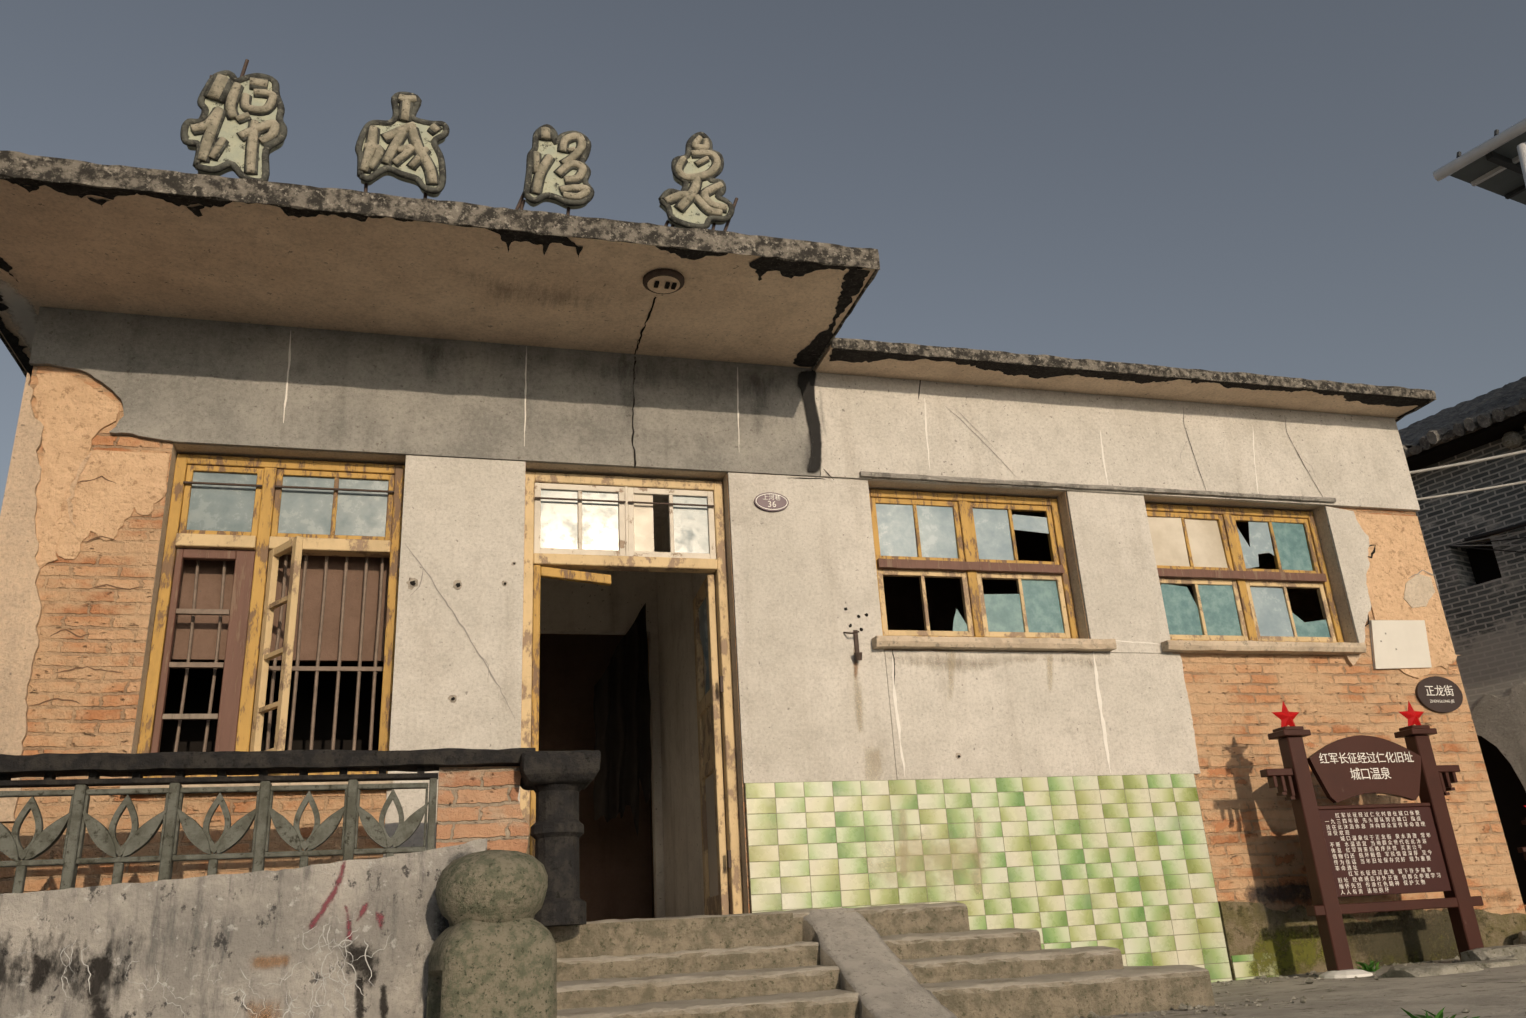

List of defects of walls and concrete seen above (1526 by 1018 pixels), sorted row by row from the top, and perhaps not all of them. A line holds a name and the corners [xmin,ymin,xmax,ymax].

peeling [0,178,413,222]
peeling [0,257,18,282]
peeling [485,228,583,257]
peeling [656,246,728,260]
peeling [749,257,1433,418]
spalling [0,295,122,566]
crack [631,297,657,468]
damp [798,370,822,473]
spalling [1404,570,1439,608]
damp [0,935,125,1018]
crack [60,916,390,1018]